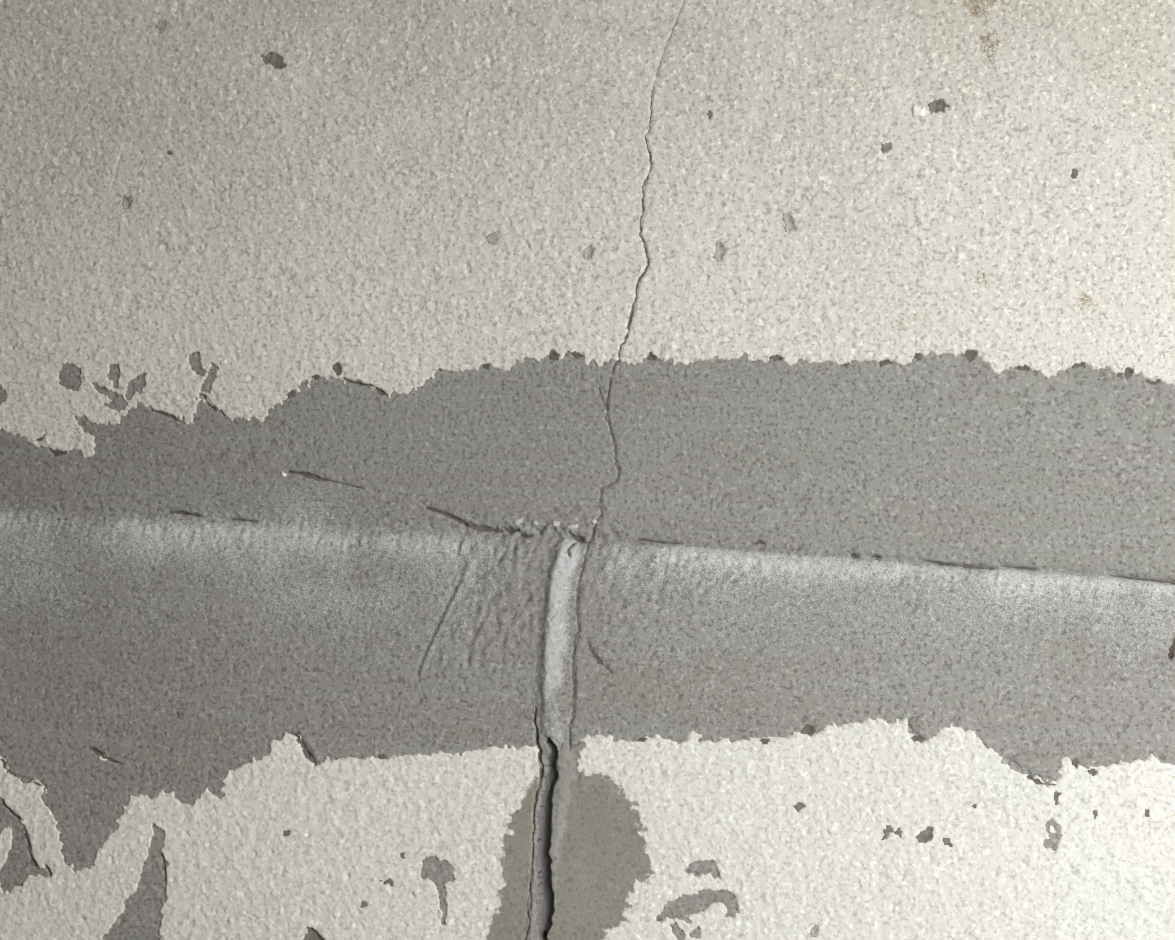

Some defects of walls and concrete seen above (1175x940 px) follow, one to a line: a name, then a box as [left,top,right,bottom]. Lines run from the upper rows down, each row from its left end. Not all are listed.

crack [426,0,685,940]
peeling [0,349,1175,873]
crack [923,560,1036,570]
crack [1110,575,1175,585]
crack [1167,637,1175,659]
peeling [0,798,52,893]
peeling [102,823,169,940]
spalling [302,927,324,940]
peeling [420,856,455,925]
leakage [486,769,655,940]
peeling [656,860,740,940]